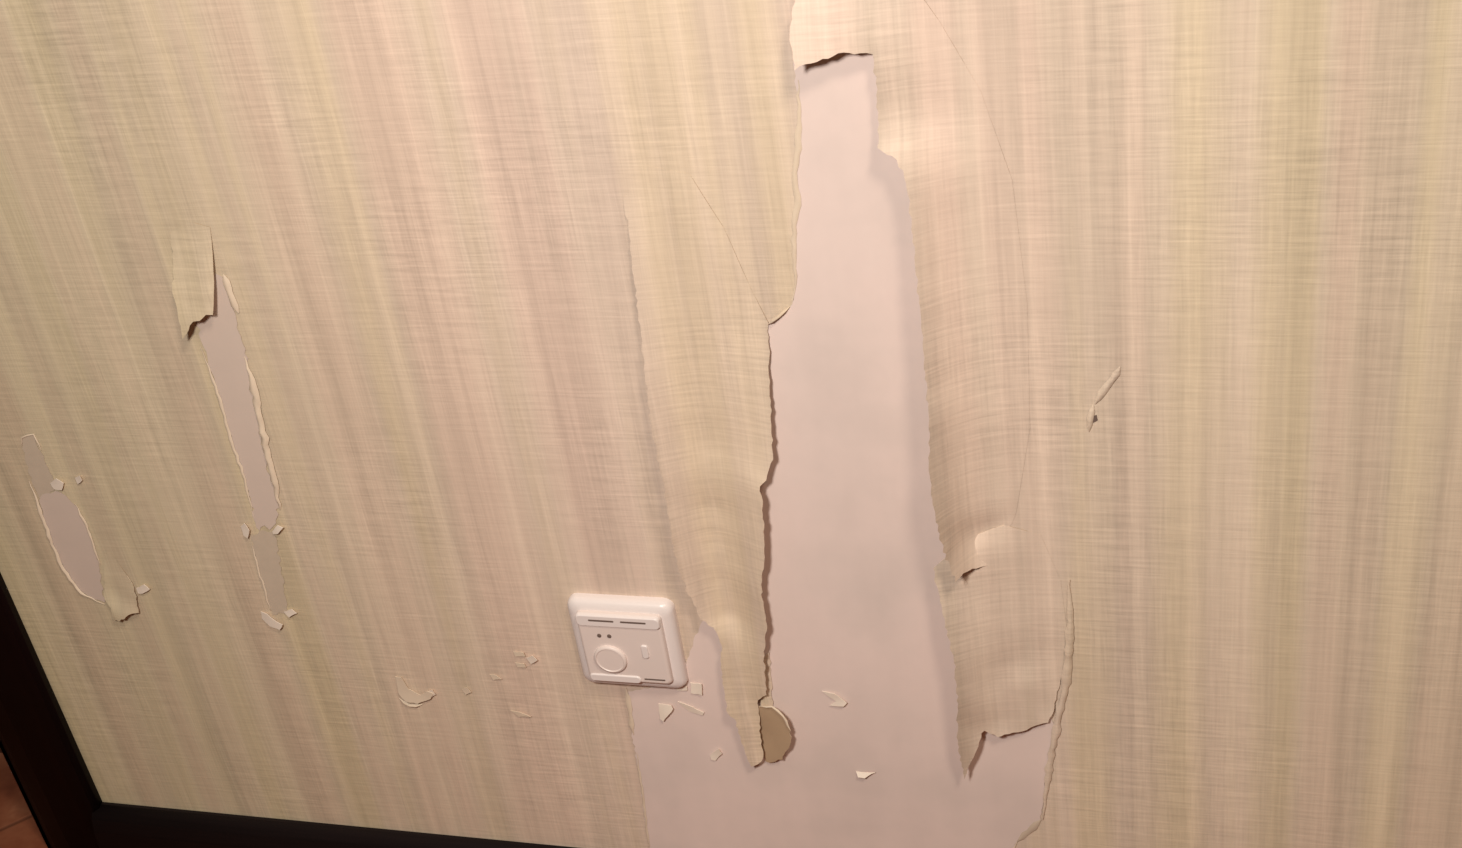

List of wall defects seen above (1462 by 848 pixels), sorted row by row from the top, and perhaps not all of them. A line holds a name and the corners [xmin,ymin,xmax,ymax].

peeling [261,609,296,630]
flaking render [628,0,1053,848]